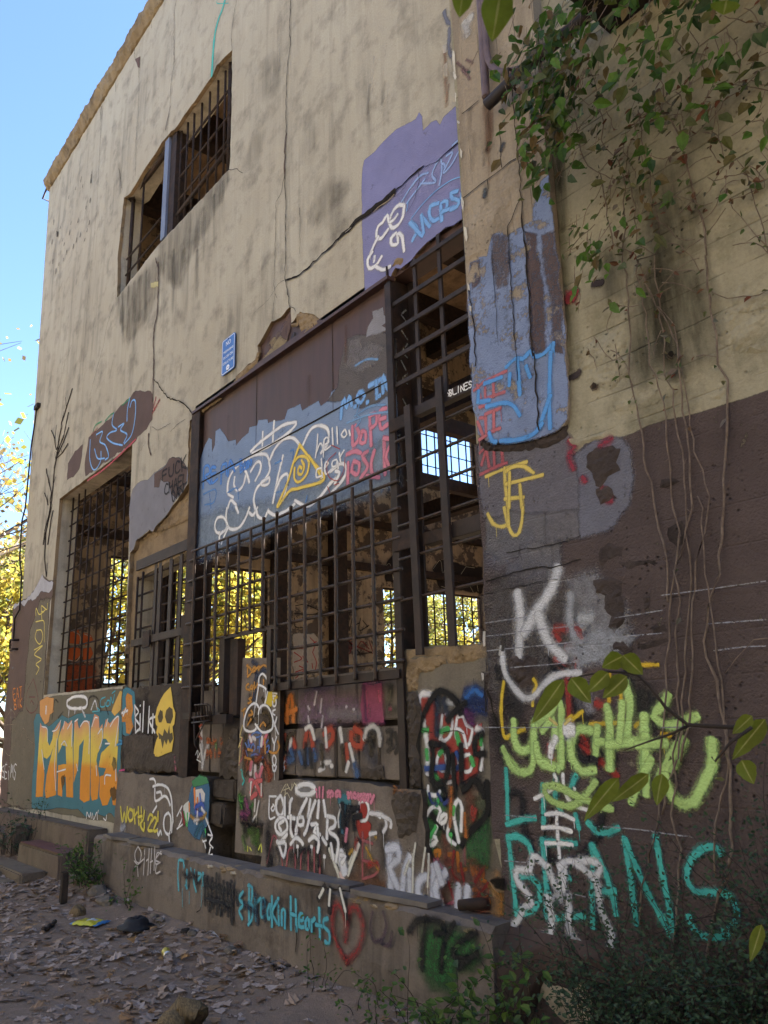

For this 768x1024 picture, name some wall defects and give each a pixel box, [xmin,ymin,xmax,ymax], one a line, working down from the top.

crack [258,0,458,316]
crack [148,258,192,455]
spalling [234,312,319,382]
crack [463,90,545,431]
water stain [638,220,682,373]
spalling [478,424,621,505]